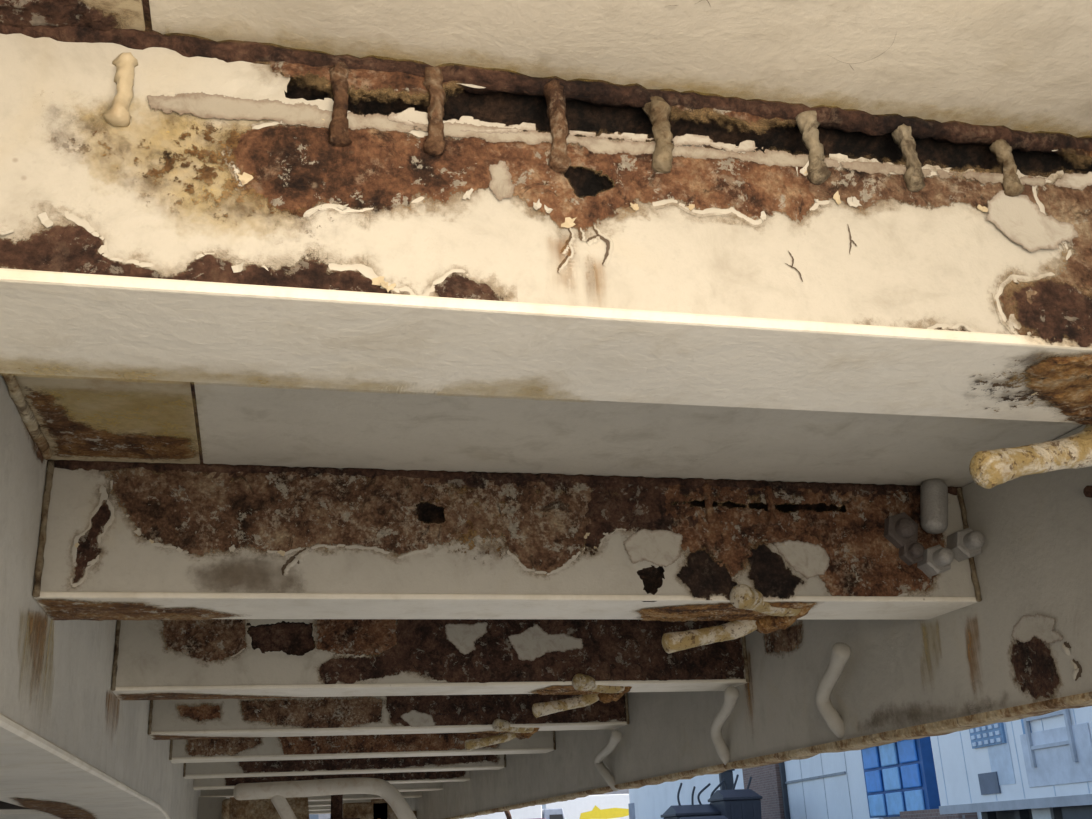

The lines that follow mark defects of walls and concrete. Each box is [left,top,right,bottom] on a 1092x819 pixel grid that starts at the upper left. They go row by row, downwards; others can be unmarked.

peeling [347,108,428,133]
peeling [443,116,552,145]
peeling [566,130,656,155]
peeling [672,134,809,169]
corrosion [53,113,1004,254]
peeling [922,169,1092,252]
corrosion [0,208,513,301]
crack [557,223,614,275]
crack [785,252,803,282]
corrosion [972,174,1092,425]
corrosion [22,387,946,786]
corrosion [12,797,97,819]